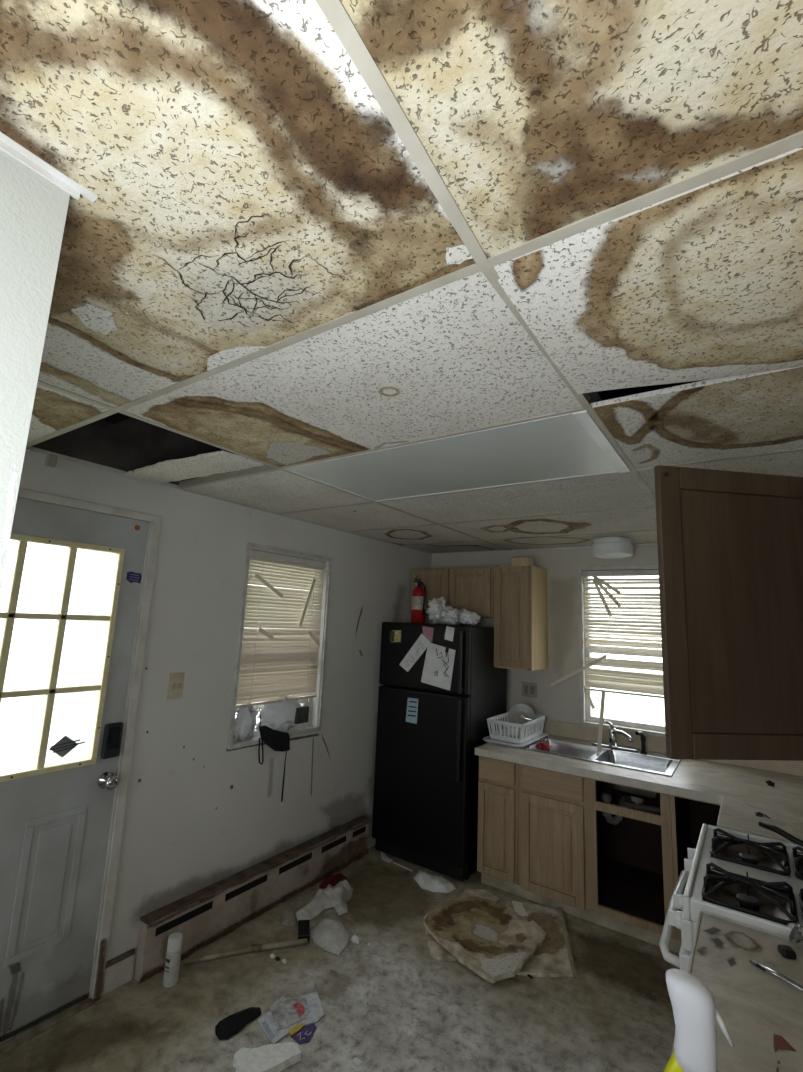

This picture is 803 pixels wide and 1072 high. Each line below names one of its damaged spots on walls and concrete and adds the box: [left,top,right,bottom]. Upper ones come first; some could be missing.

water stain [0,0,490,382]
crack [154,214,347,324]
water stain [141,396,408,467]
water stain [481,519,590,545]
water stain [341,0,803,291]
water stain [577,149,803,463]